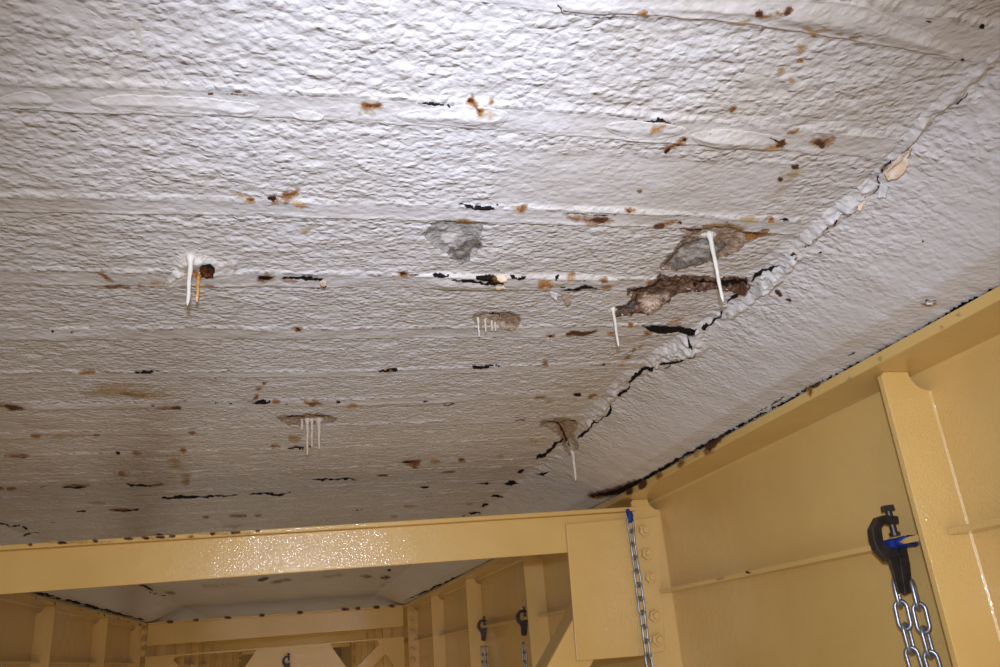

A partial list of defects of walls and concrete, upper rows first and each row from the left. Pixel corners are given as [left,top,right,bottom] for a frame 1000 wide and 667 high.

corrosion [467,94,494,116]
crack [634,116,675,124]
corrosion [766,128,799,151]
corrosion [267,189,307,208]
corrosion [566,207,635,225]
spalling [424,219,483,263]
spalling [603,222,771,317]
spalling [472,310,521,337]
crack [458,175,888,517]
crack [590,289,993,498]
spalling [276,413,337,455]
spalling [539,418,579,481]